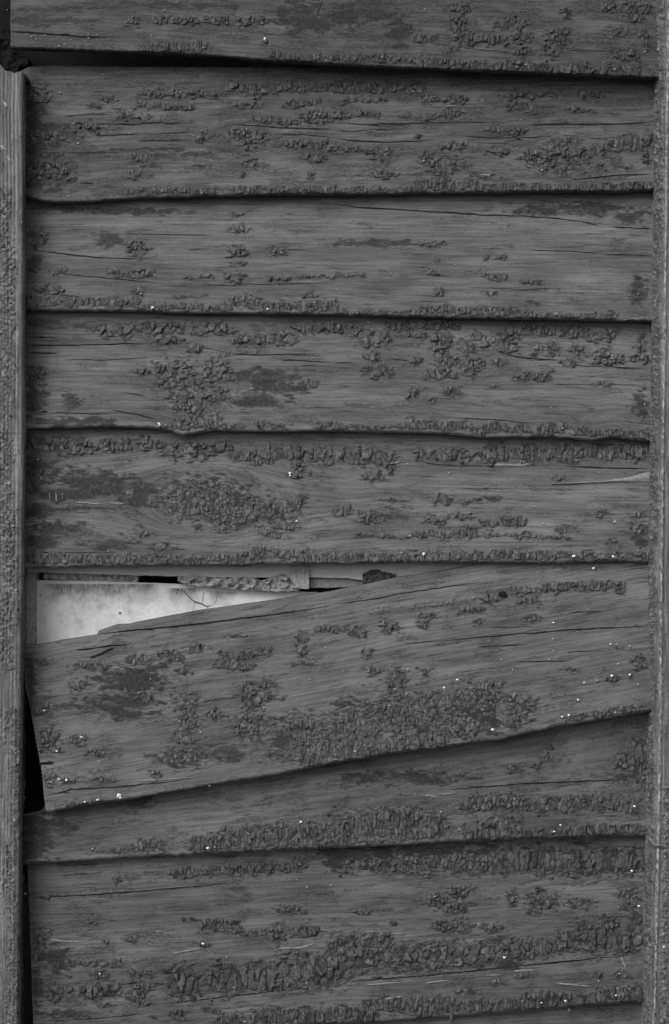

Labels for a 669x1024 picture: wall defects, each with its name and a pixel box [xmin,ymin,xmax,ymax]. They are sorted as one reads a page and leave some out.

crack [342,205,652,229]
crack [76,581,483,658]